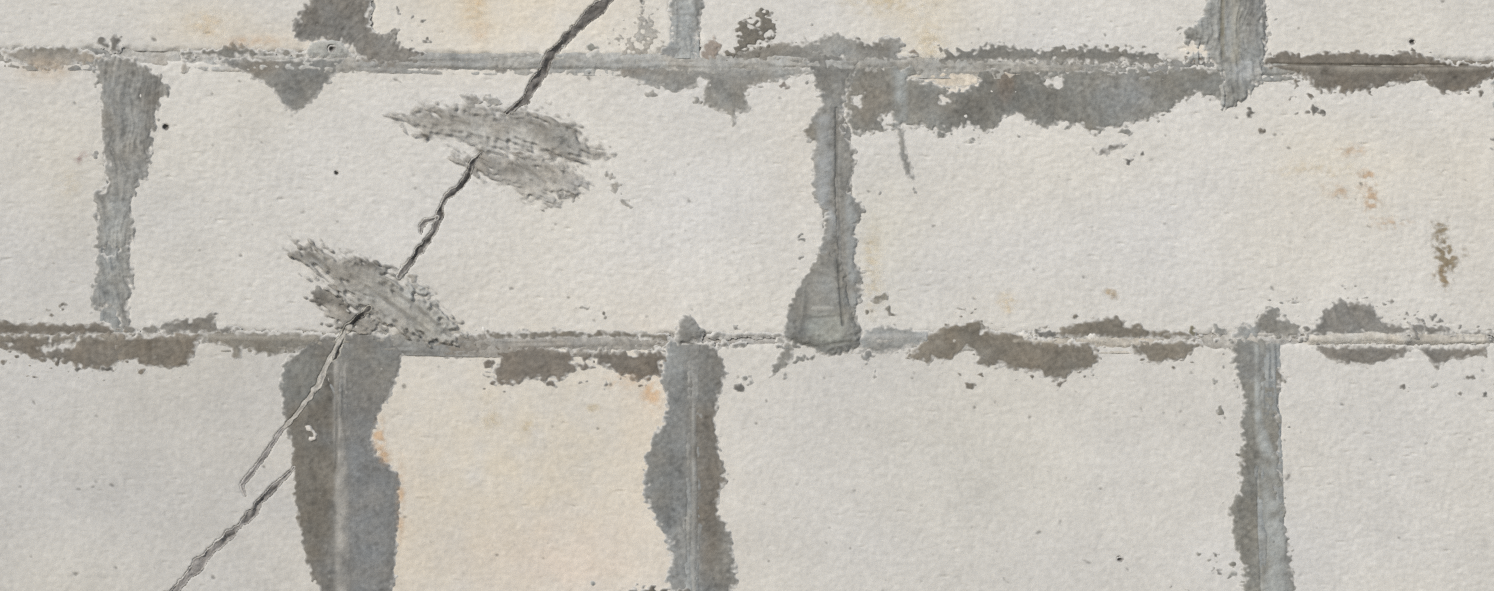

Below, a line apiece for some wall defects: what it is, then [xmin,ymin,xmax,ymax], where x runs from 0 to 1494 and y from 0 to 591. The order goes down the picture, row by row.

crack [504,0,614,116]
crack [396,151,482,280]
crack [170,305,373,591]